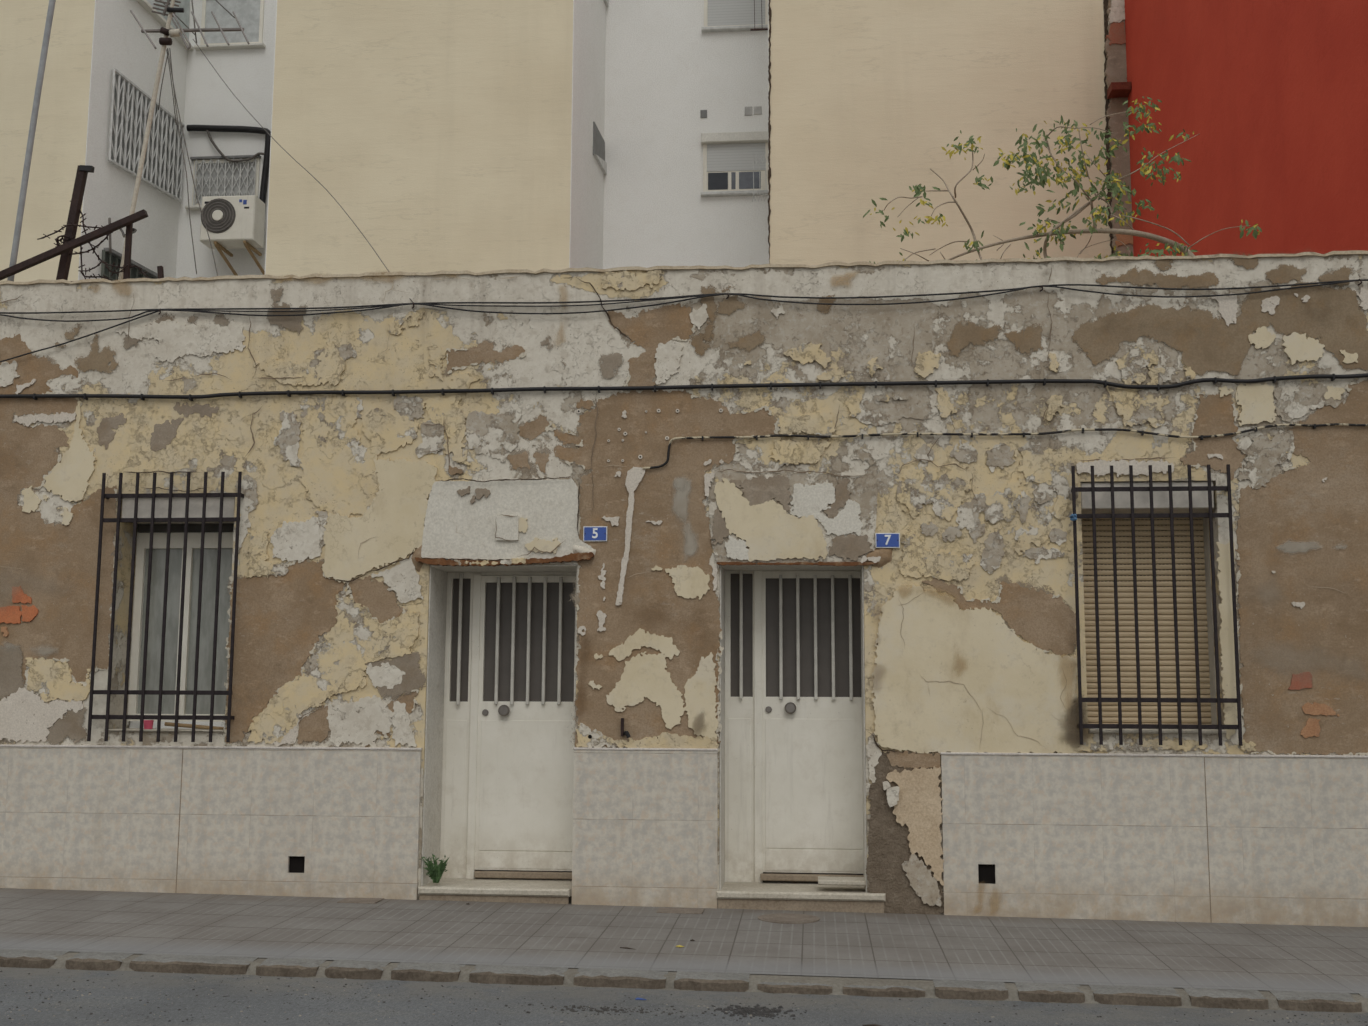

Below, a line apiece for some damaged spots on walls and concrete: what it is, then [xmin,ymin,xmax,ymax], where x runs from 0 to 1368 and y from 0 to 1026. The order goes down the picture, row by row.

spalling [0,284,1060,752]
spalling [866,0,1368,915]